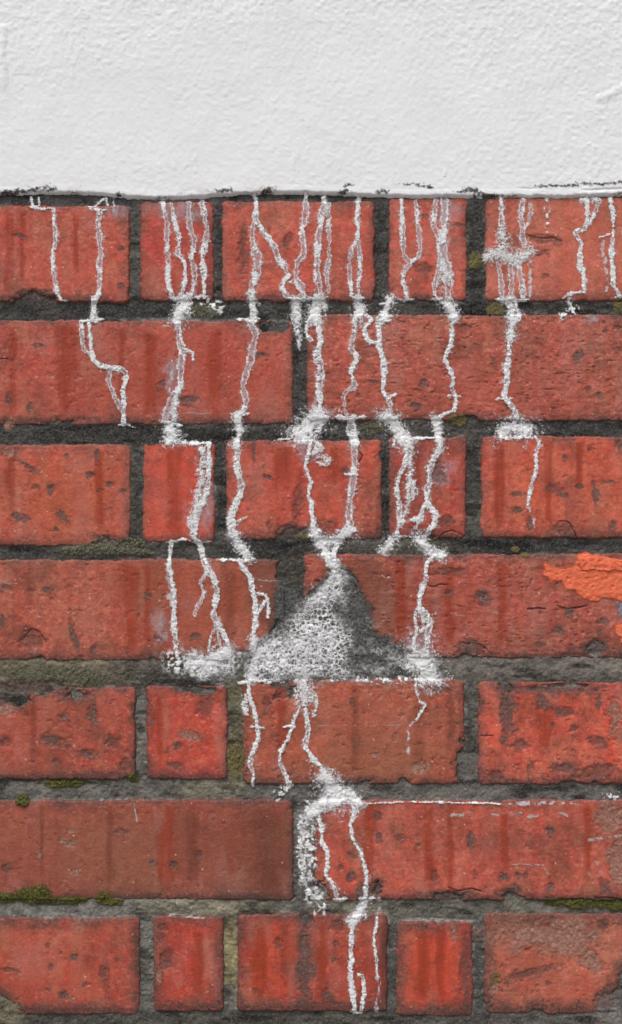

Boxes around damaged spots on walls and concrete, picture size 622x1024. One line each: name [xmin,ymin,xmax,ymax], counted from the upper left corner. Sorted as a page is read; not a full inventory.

damp [0,185,68,302]
damp [79,192,136,428]
damp [159,180,622,1014]